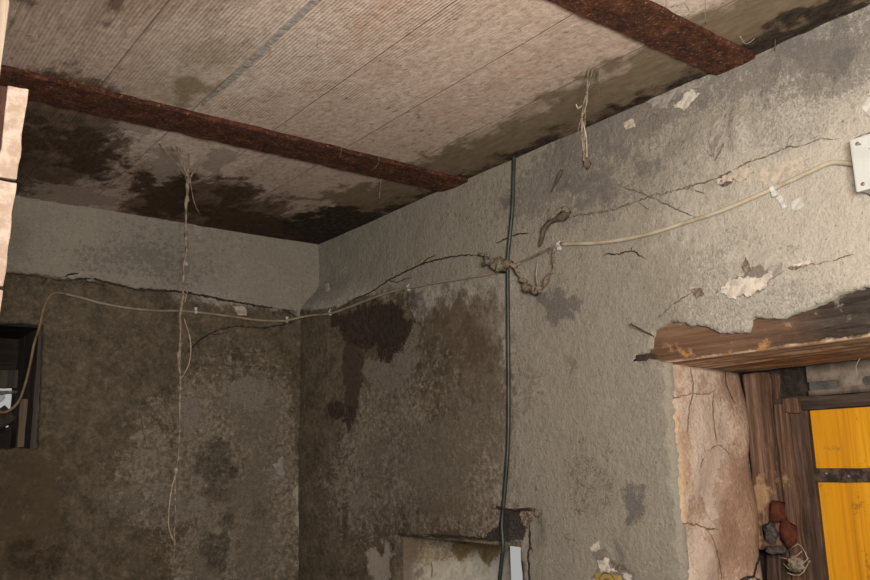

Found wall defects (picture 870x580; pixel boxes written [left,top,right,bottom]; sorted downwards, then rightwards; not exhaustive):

damp [688,0,870,55]
damp [175,76,213,107]
damp [411,47,710,179]
damp [18,111,438,244]
crack [573,132,870,217]
spalling [716,257,815,299]
damp [326,291,423,431]
crack [672,368,735,470]
spalling [590,541,635,580]
crack [683,522,760,580]